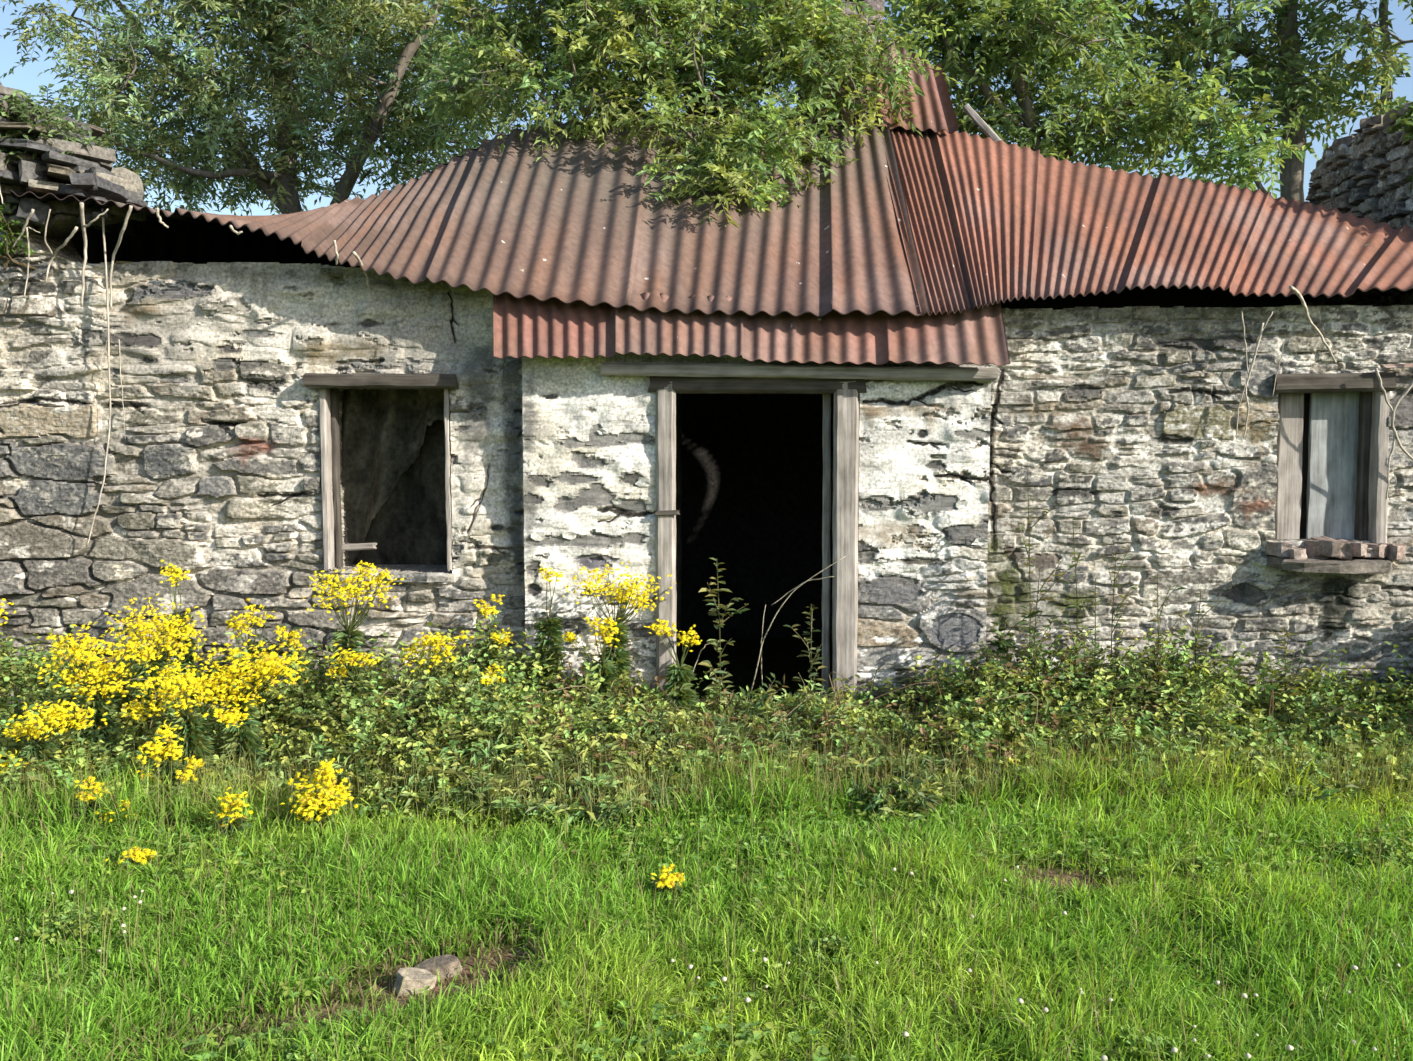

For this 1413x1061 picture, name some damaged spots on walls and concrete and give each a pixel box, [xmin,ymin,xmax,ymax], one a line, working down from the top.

peeling [523,424,655,512]
peeling [925,461,945,470]
peeling [954,429,990,440]
peeling [525,532,649,596]
peeling [860,493,1061,603]
peeling [930,613,982,646]
leakage [1322,577,1356,639]